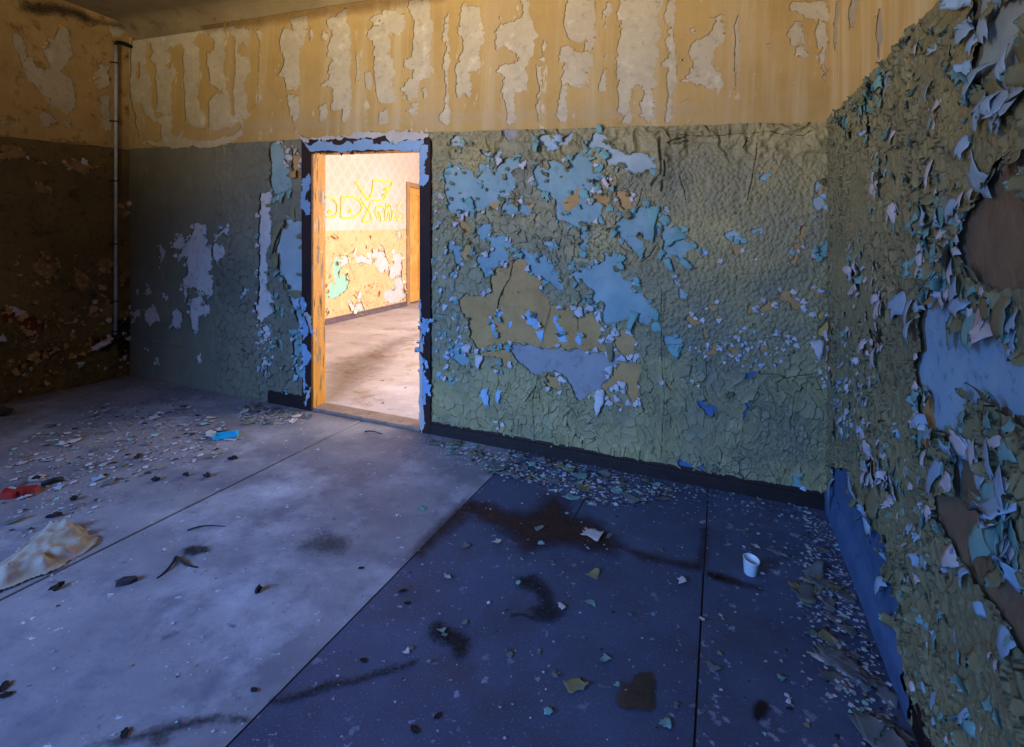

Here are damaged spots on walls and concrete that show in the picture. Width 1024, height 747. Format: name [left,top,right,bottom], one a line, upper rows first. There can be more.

peeling [11,24,76,129]
peeling [107,21,262,149]
crack [638,131,806,204]
crack [497,258,519,317]
crack [511,293,665,459]
peeling [240,0,1024,747]